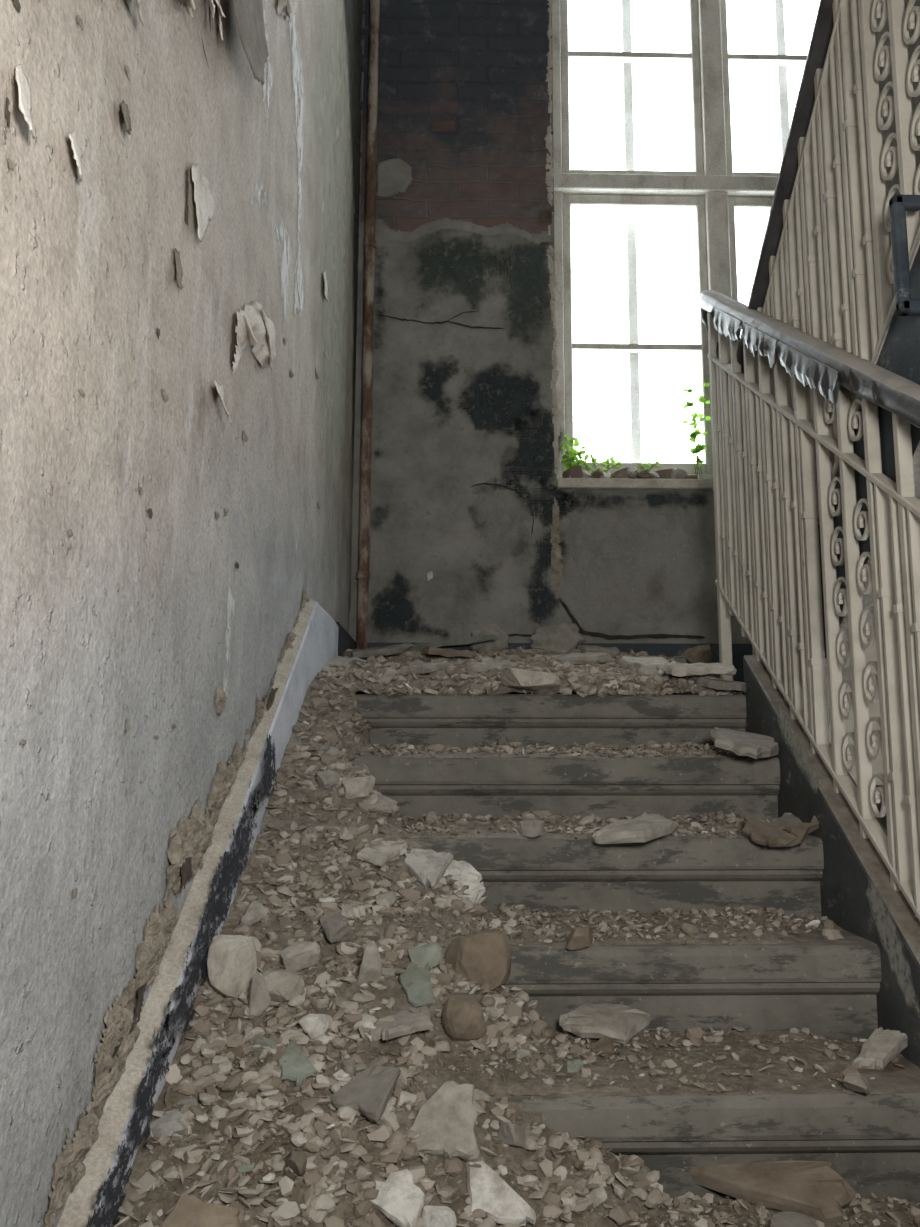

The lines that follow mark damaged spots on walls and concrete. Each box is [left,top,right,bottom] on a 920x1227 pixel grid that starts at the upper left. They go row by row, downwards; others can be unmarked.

peeling [175,0,299,85]
peeling [5,64,36,139]
peeling [68,132,83,182]
peeling [185,163,214,242]
flaking render [360,0,560,474]
crack [375,311,504,329]
mould [416,232,550,344]
peeling [214,301,287,442]
damp [420,362,623,623]
damp [646,493,705,507]
mould [372,575,448,636]
flaking render [43,587,311,1227]